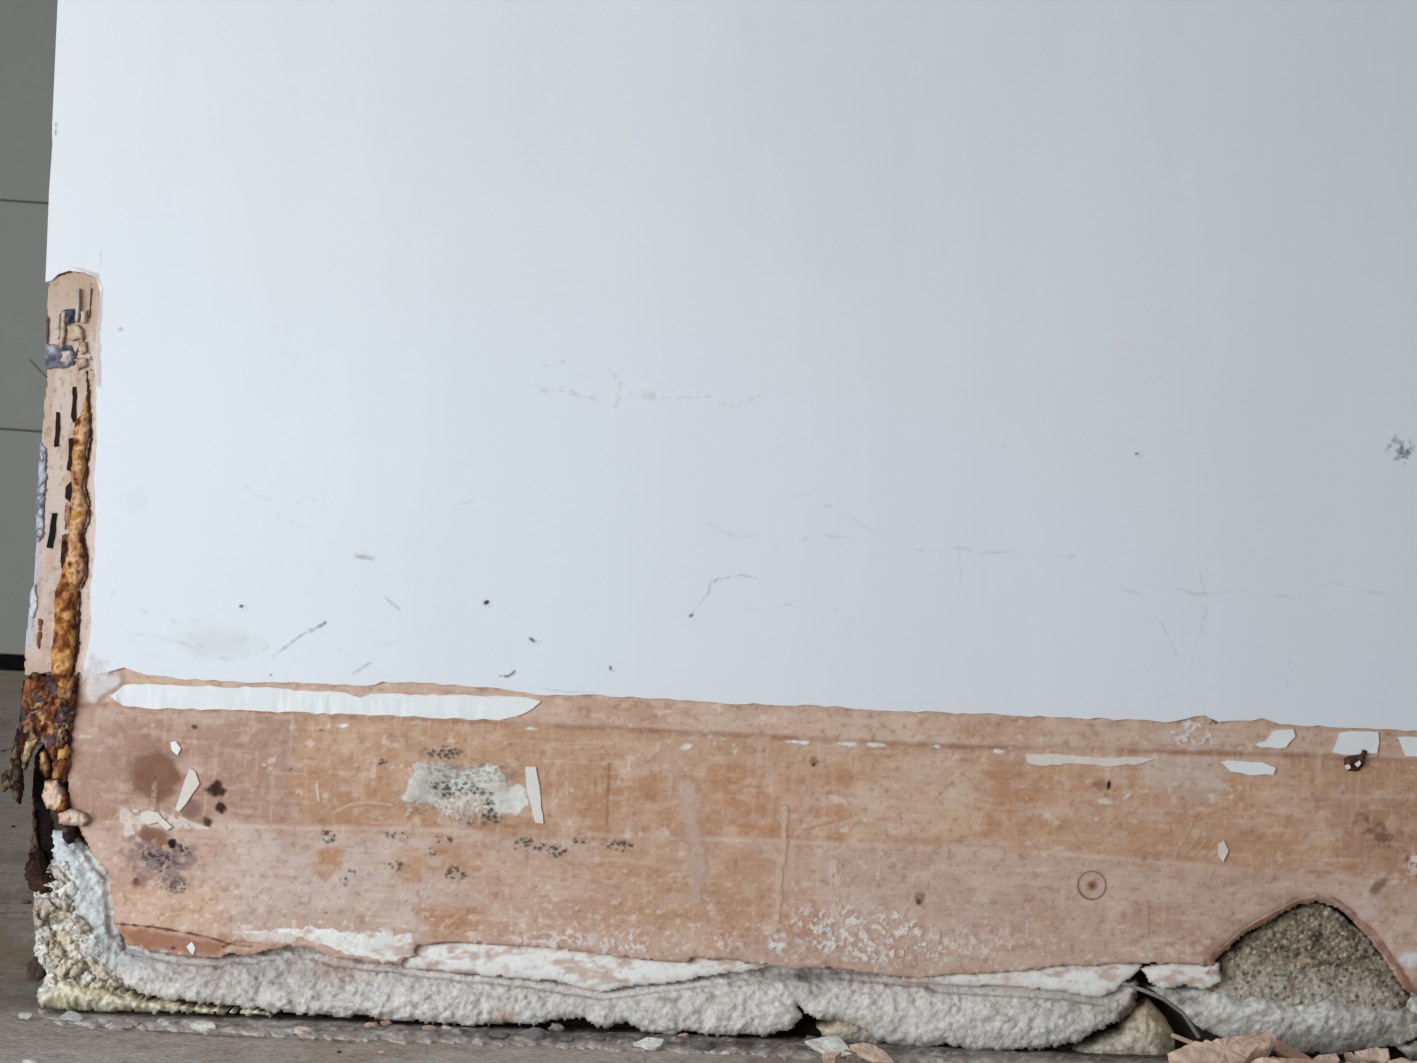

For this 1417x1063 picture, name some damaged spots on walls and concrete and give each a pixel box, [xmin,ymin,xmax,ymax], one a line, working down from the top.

rust [37,394,90,687]
rust [39,744,90,845]
leakage [410,746,511,826]
leakage [515,838,584,857]
peeling [26,668,1417,1063]